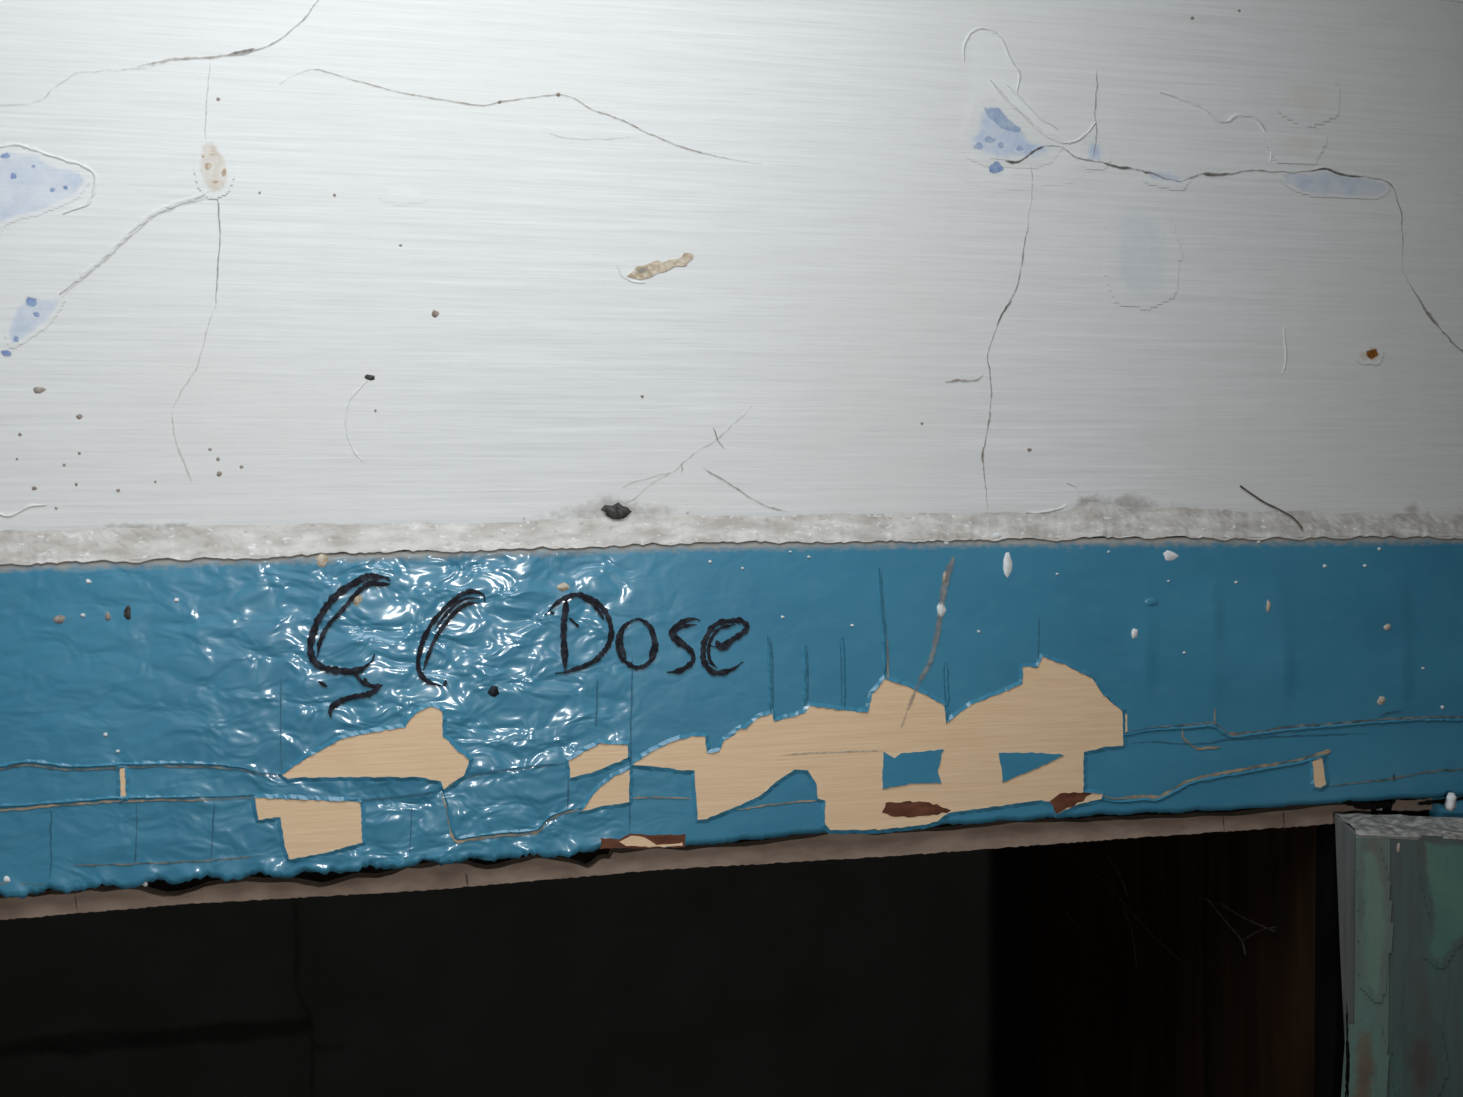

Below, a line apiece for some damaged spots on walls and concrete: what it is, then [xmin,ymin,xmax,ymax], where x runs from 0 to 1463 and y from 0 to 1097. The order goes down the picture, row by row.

crack [140,0,318,66]
crack [280,69,759,164]
crack [214,199,222,309]
crack [991,74,1463,352]
crack [945,206,1031,506]
peeling [251,702,474,863]
peeling [565,653,1127,849]